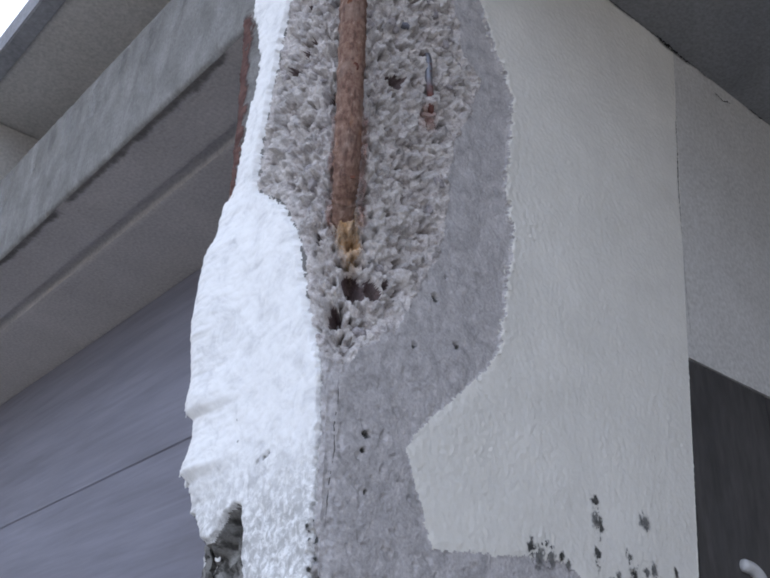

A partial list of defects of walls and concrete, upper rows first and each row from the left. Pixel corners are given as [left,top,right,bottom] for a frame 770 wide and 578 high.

corrosion [337,220,361,271]
peeling [257,0,581,578]
water stain [527,537,571,570]
water stain [591,495,604,567]
water stain [626,548,658,578]